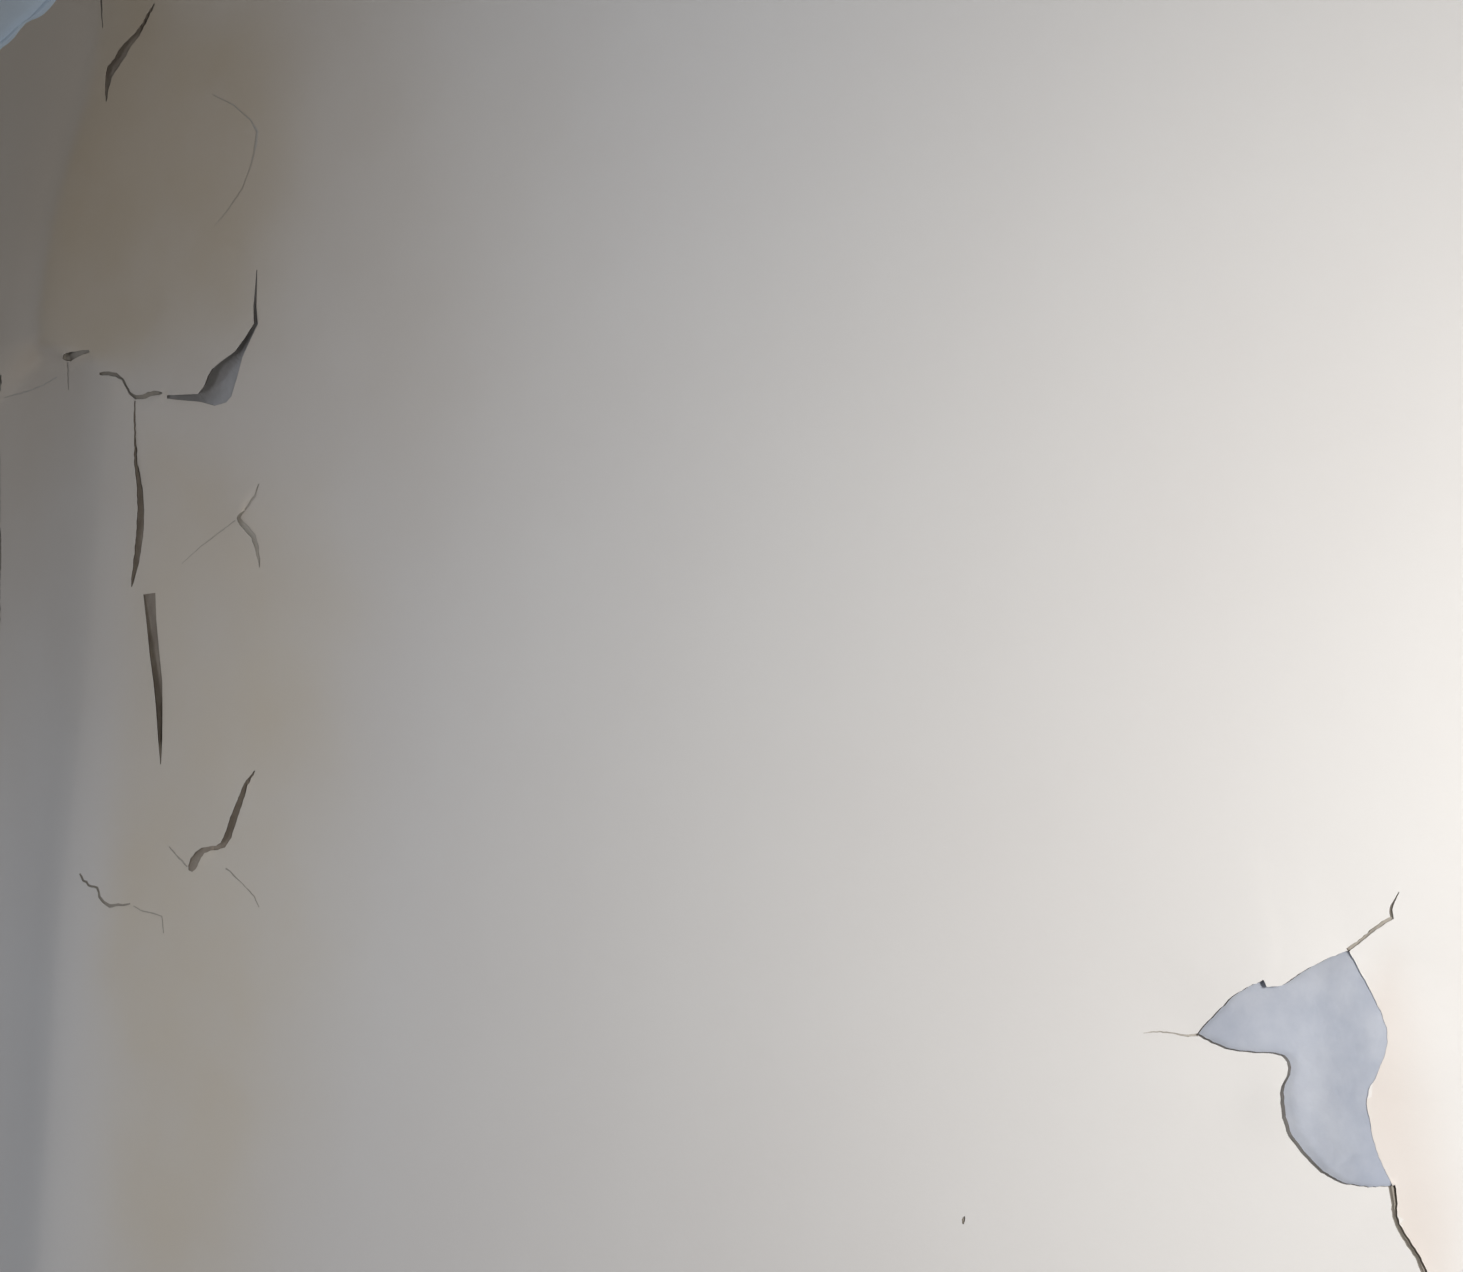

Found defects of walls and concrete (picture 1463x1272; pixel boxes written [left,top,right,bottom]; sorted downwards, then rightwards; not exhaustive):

crack [100,0,155,102]
crack [213,94,258,225]
crack [0,459,8,610]
crack [100,371,163,764]
crack [185,484,260,567]
crack [79,873,164,933]
crack [169,771,259,907]
spalling [1146,892,1463,1272]